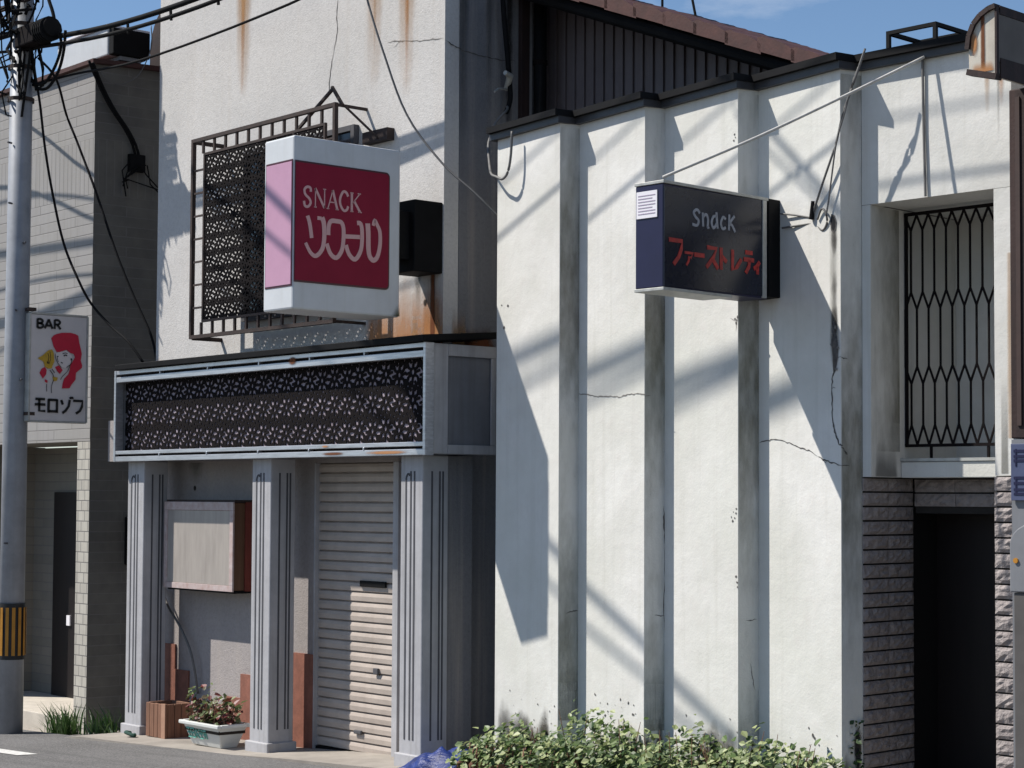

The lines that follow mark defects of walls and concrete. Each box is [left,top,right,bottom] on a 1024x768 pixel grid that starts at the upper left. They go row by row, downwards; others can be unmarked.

crack [389,38,514,61]
rust [971,16,993,71]
rust [369,275,493,347]
crack [580,391,650,399]
crack [760,356,849,466]